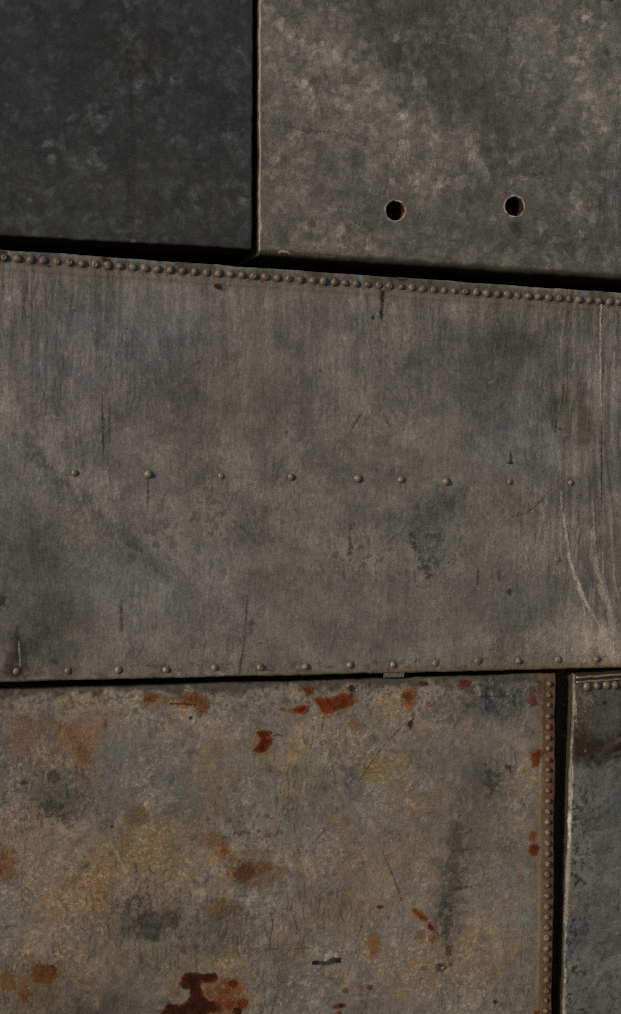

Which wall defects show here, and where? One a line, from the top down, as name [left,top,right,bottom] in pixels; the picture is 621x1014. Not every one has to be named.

rust [141,690,210,715]
rust [279,685,362,727]
rust [250,730,283,754]
rust [530,747,544,767]
rust [529,831,540,856]
rust [412,908,437,943]
rust [160,972,252,1014]